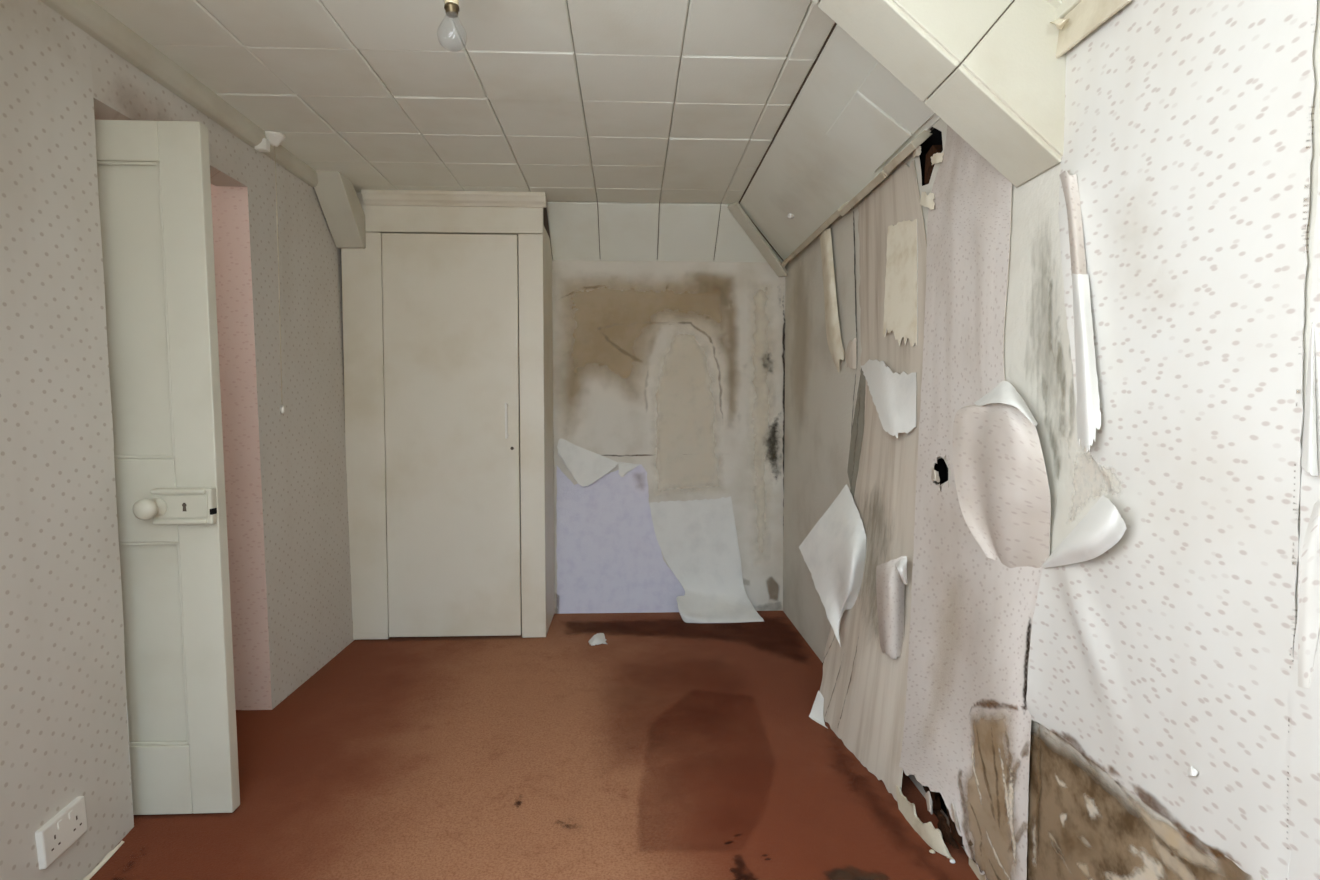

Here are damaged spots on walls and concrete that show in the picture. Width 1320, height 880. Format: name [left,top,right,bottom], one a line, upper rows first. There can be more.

spalling [913,128,944,210]
damp [767,423,779,478]
flaking render [848,369,865,497]
spalling [896,785,973,863]